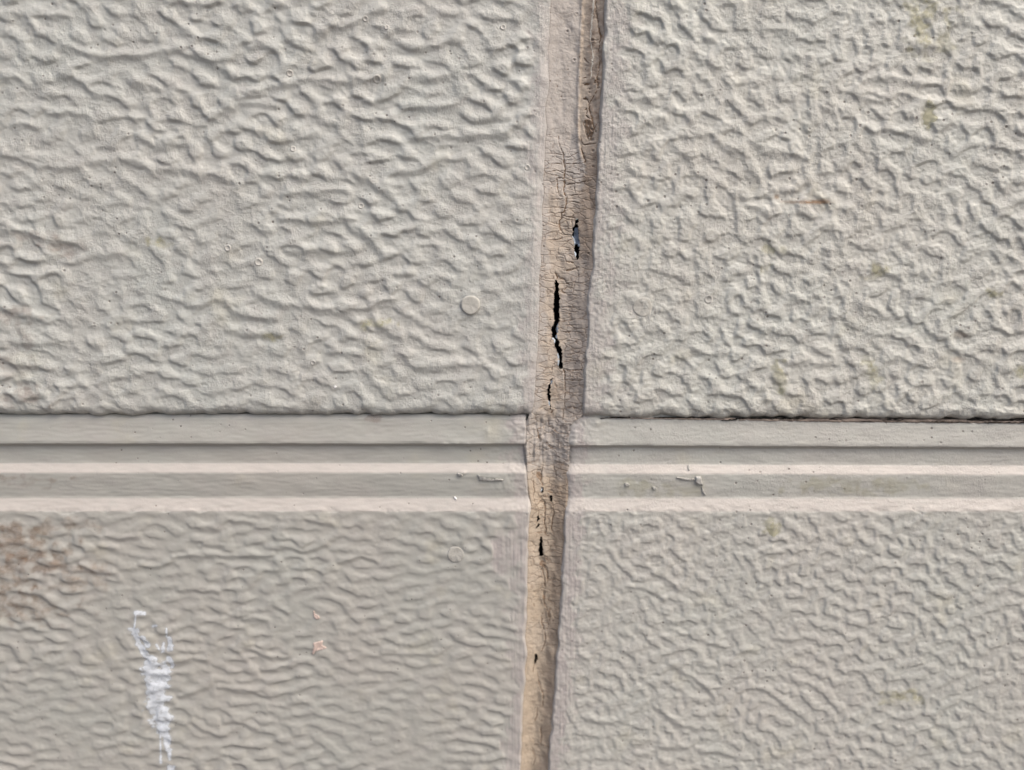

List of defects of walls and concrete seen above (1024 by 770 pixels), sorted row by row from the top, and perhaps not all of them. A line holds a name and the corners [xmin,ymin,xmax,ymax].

damp [139,624,176,770]
crack [532,0,602,765]